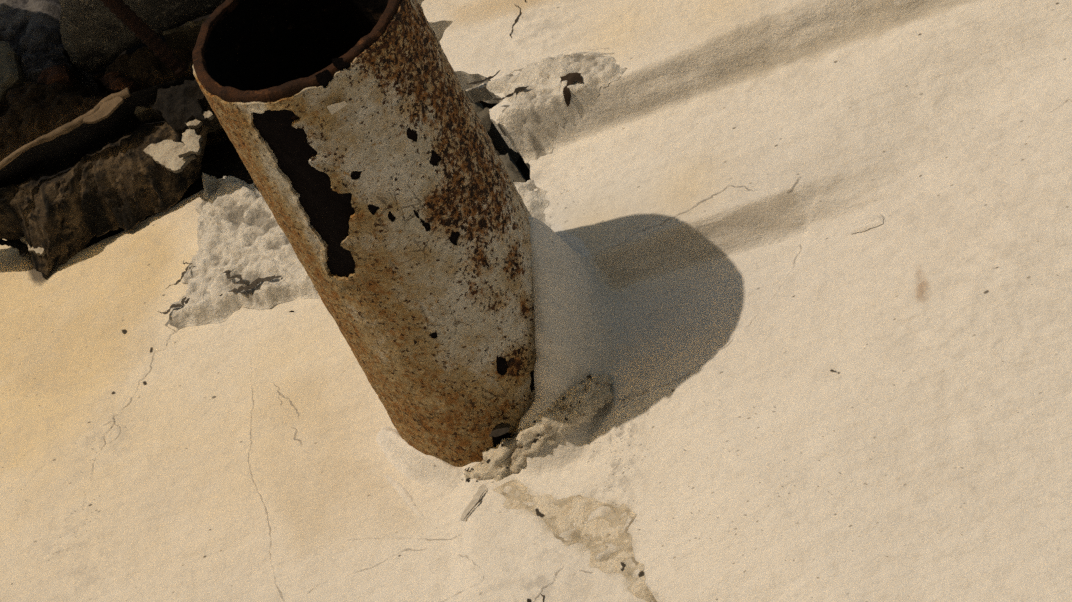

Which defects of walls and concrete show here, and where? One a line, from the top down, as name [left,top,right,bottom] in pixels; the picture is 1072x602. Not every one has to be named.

peeling [157,0,657,602]